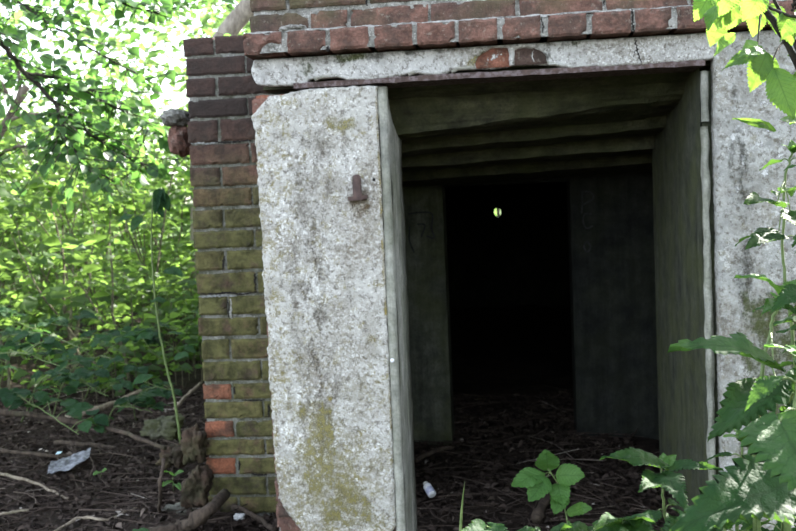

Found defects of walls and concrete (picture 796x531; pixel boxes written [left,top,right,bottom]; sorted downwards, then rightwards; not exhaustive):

crack [631,9,642,65]
spalling [278,496,301,531]